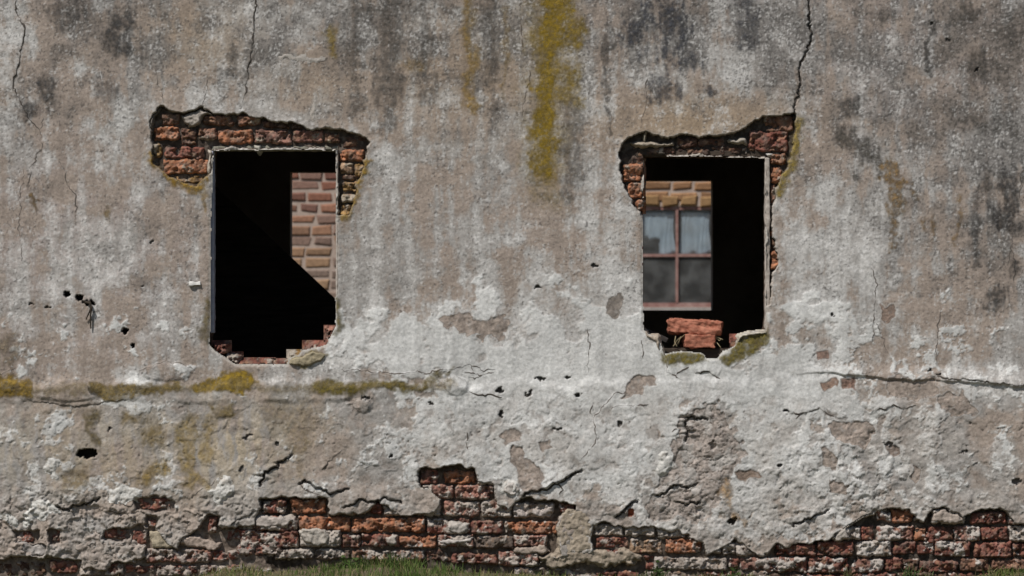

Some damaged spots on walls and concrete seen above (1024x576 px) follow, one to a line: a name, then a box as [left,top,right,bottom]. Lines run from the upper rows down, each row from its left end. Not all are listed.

crack [12,1,78,261]
spalling [150,92,369,215]
water stain [529,0,584,178]
spalling [619,113,796,297]
crack [794,0,813,114]
spalling [0,399,1024,576]